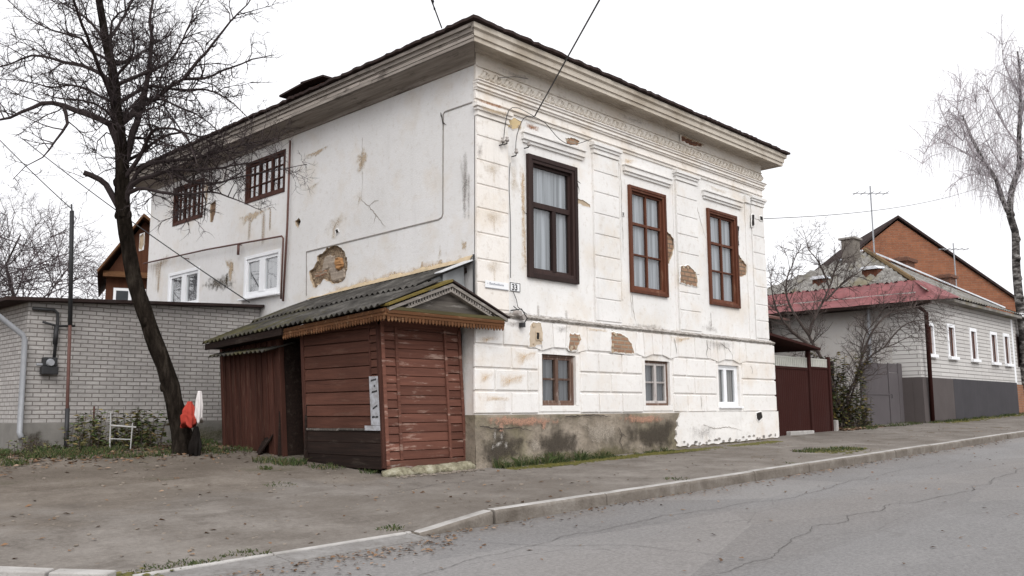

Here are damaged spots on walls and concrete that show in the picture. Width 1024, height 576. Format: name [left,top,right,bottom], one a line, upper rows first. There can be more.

spalling [309,228,348,288]
spalling [667,231,698,288]
spalling [738,213,763,277]
spalling [528,321,543,348]
spalling [568,332,582,352]
spalling [610,331,635,355]
leakage [485,430,578,462]
leakage [629,422,673,447]